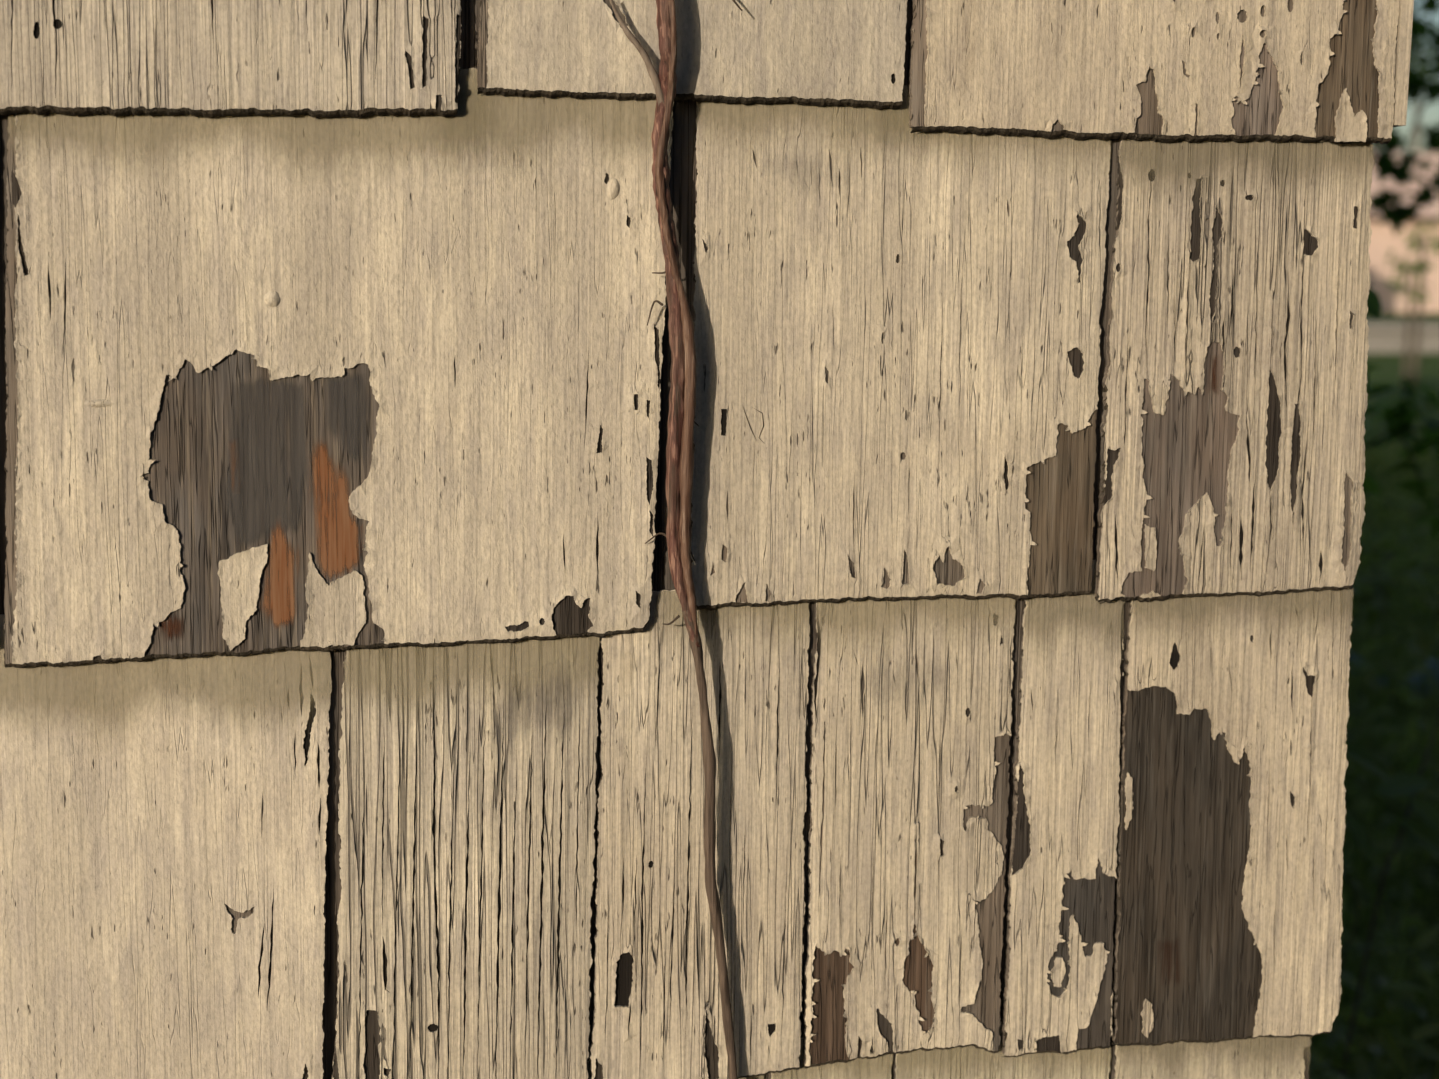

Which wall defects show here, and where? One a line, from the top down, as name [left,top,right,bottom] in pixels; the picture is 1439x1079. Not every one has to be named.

peeling [1134,68,1163,135]
peeling [1231,6,1283,136]
peeling [1314,0,1380,142]
peeling [1067,214,1086,283]
peeling [1067,347,1084,378]
peeling [1121,173,1240,597]
peeling [139,349,386,656]
peeling [1003,410,1121,595]
peeling [955,686,1262,1052]
peeling [809,946,893,1065]
peeling [895,849,935,1034]